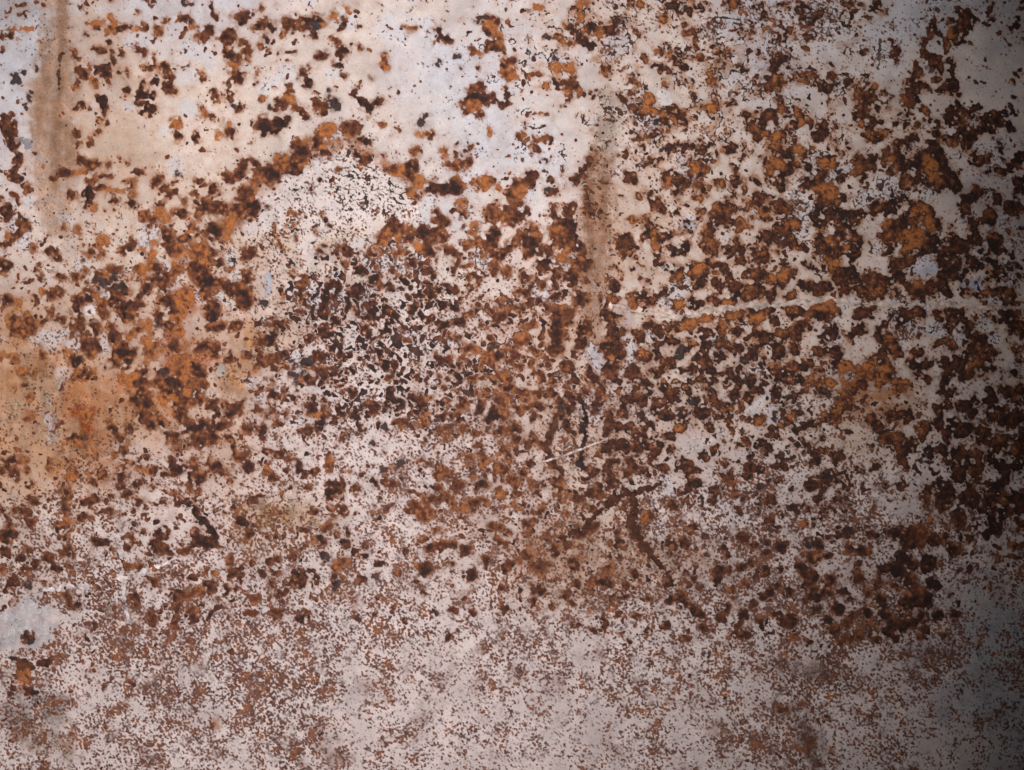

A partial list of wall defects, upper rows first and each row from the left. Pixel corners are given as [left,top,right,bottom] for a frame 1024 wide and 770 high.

rust [3,70,26,85]
rust [119,43,178,118]
rust [169,96,216,144]
rust [215,122,235,150]
rust [175,0,356,113]
rust [252,64,341,138]
rust [349,84,385,116]
rust [379,50,391,71]
rust [400,19,462,68]
rust [514,111,559,164]
rust [0,254,15,277]
rust [288,368,332,388]